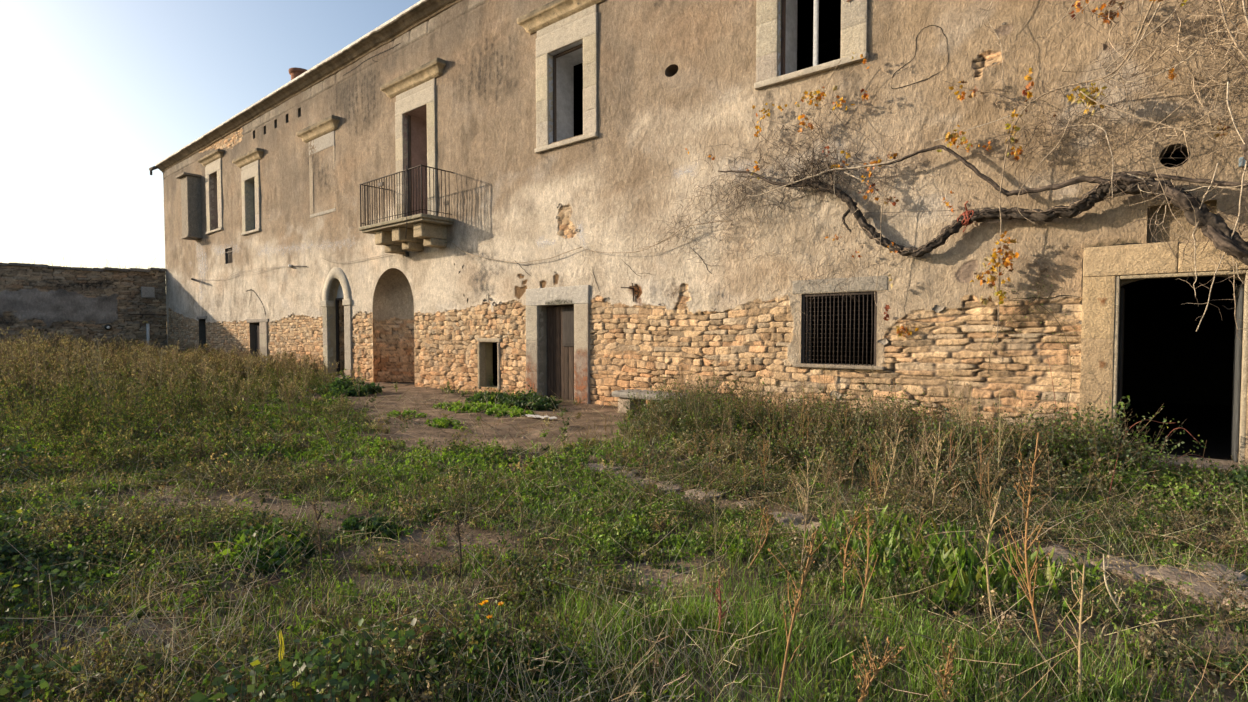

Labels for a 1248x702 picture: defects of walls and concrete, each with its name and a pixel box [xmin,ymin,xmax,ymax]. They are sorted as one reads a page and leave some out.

spalling [556,203,580,239]
spalling [351,271,559,395]
spalling [589,260,1082,439]